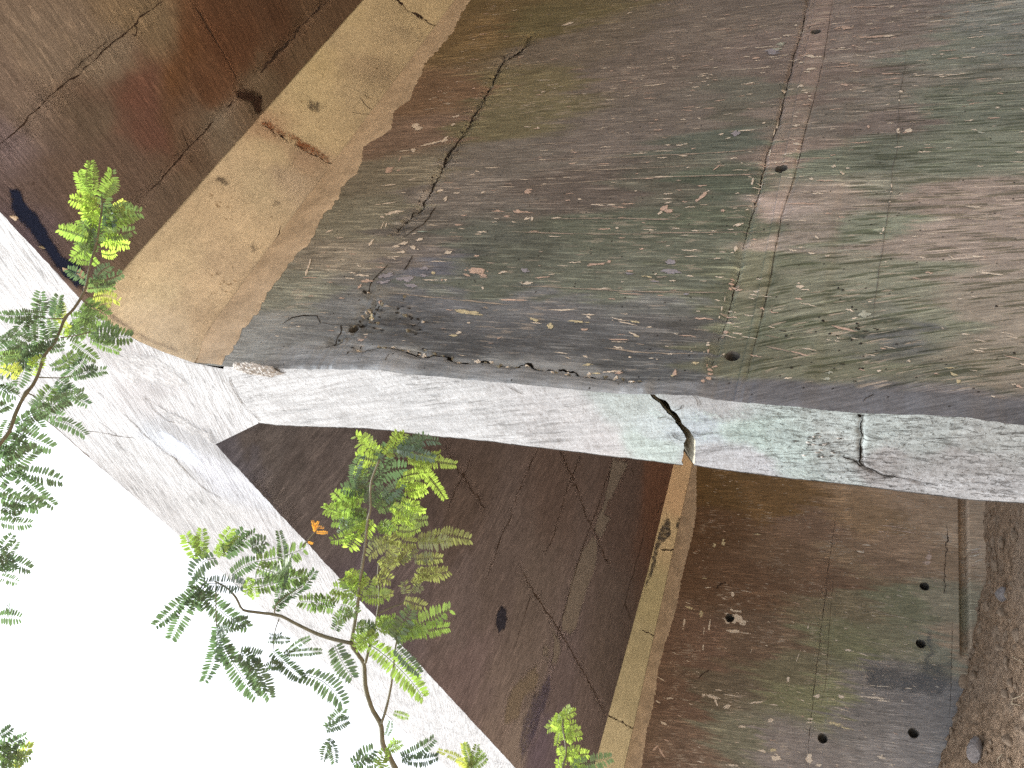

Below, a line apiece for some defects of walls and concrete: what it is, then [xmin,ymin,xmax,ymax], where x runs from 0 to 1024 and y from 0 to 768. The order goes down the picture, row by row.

crack [0,1,163,144]
crack [135,2,332,204]
crack [368,36,532,292]
crack [367,348,706,464]
crack [842,394,938,486]
damp [496,606,508,632]